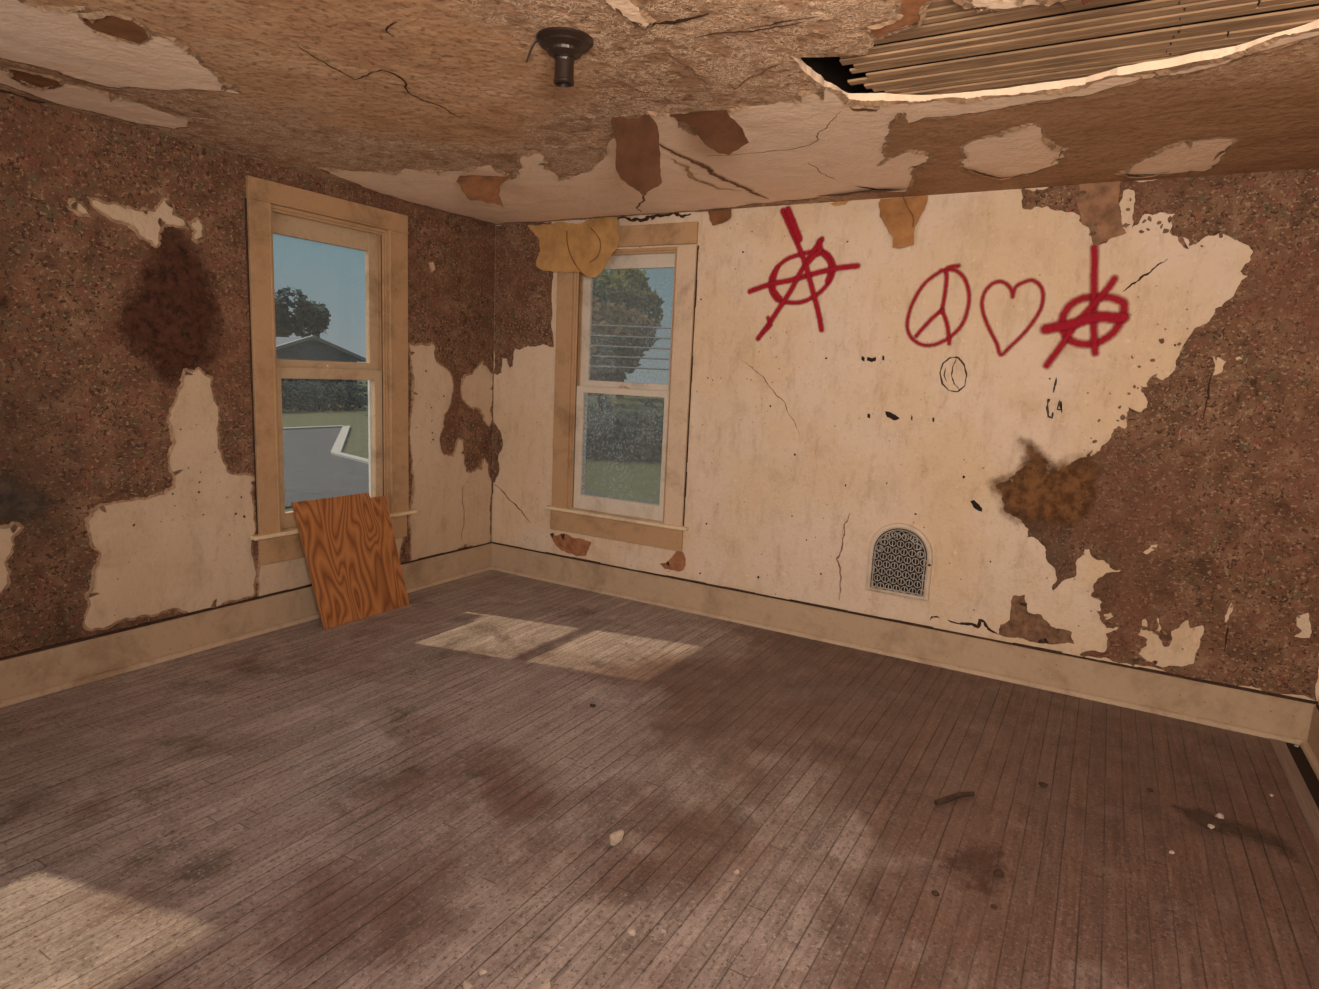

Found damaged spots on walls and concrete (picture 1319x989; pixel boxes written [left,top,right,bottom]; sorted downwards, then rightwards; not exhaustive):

peeling [0,0,243,129]
crack [297,45,460,118]
crack [659,111,841,199]
peeling [67,197,206,248]
crack [618,194,691,222]
damp [120,227,221,381]
peeling [316,0,1319,563]
peeling [957,123,1319,701]
peeling [82,367,312,631]
damp [992,441,1096,523]
peeling [0,521,24,594]
crack [836,514,850,599]